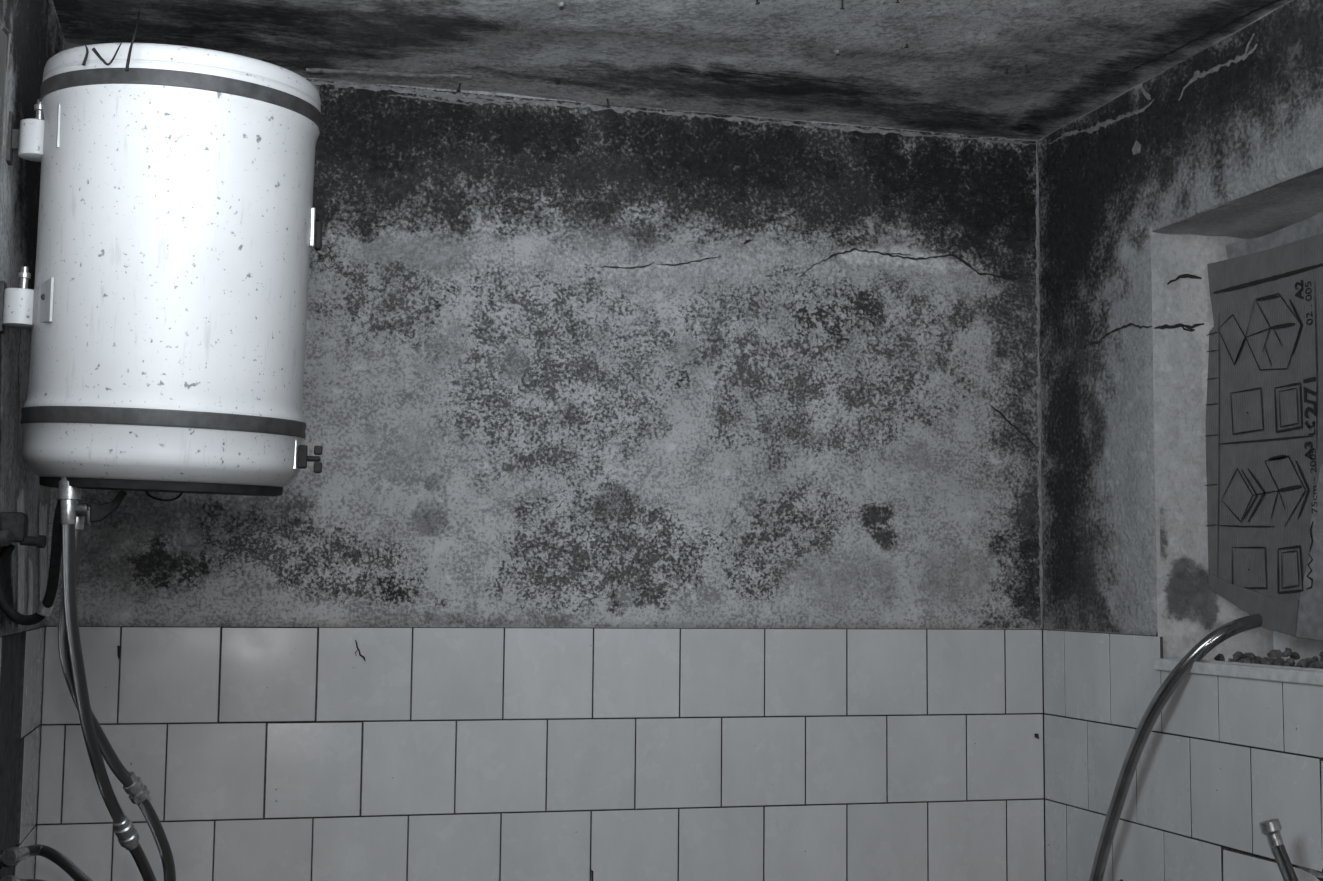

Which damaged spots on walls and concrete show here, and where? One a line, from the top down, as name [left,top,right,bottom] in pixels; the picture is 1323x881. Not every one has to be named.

crack [601,239,752,269]
crack [1167,274,1201,285]
leakage [307,0,1323,632]
crack [1086,323,1204,345]
mould [127,500,446,606]